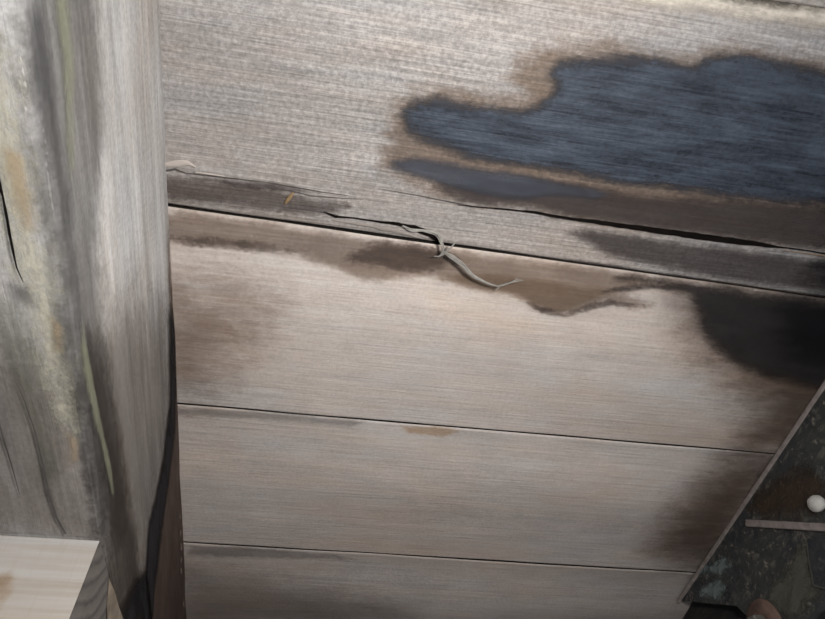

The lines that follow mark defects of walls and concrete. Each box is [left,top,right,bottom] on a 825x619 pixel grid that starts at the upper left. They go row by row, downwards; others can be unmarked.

damp [400,56,825,204]
crack [0,180,23,282]
crack [166,168,451,246]
crack [378,188,825,257]
damp [696,289,825,422]
crack [0,425,20,495]
crack [16,383,66,534]
damp [108,317,187,619]